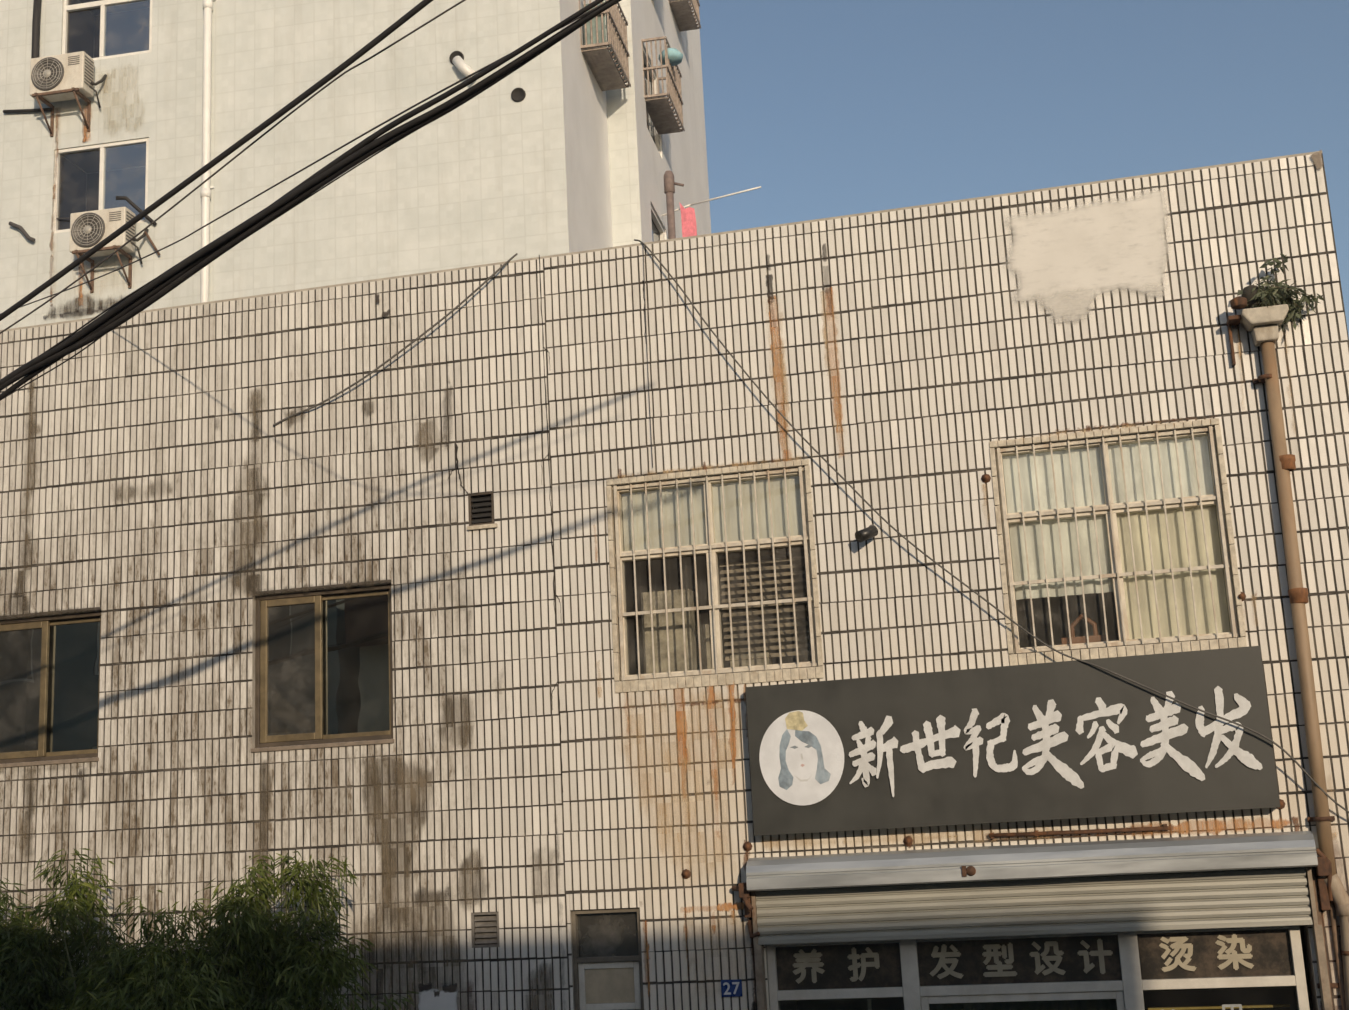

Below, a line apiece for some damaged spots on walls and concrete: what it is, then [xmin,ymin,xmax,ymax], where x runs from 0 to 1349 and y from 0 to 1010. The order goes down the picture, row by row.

corrosion [766,255,787,462]
leakage [249,390,260,442]
corrosion [831,376,843,433]
leakage [234,466,265,597]
leakage [441,697,470,747]
corrosion [667,684,745,797]
leakage [359,758,479,1010]
corrosion [712,902,754,956]
leakage [527,965,552,1010]